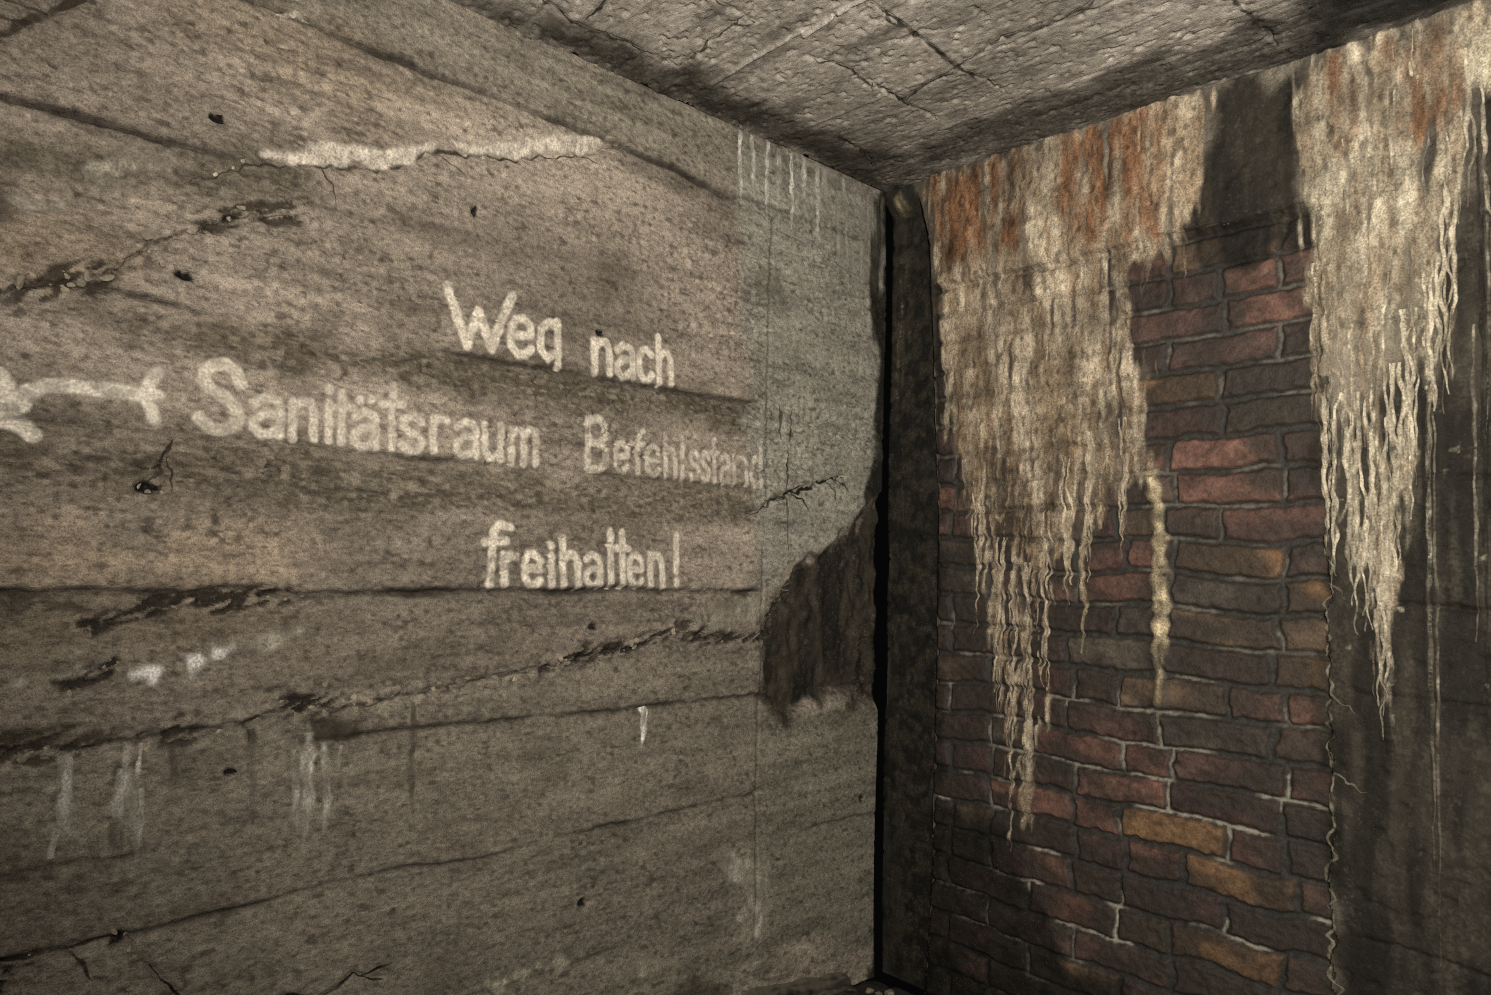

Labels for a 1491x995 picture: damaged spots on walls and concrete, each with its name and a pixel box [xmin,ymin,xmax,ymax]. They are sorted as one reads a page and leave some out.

crack [0,0,87,37]
crack [542,0,755,65]
crack [813,0,1094,120]
crack [1233,0,1282,45]
crack [7,147,613,302]
rust [922,88,1216,838]
leakage [501,0,1457,995]
leakage [1314,91,1491,995]
crack [0,935,127,979]
crack [148,964,180,995]
crack [284,964,389,995]
leakage [483,956,569,994]